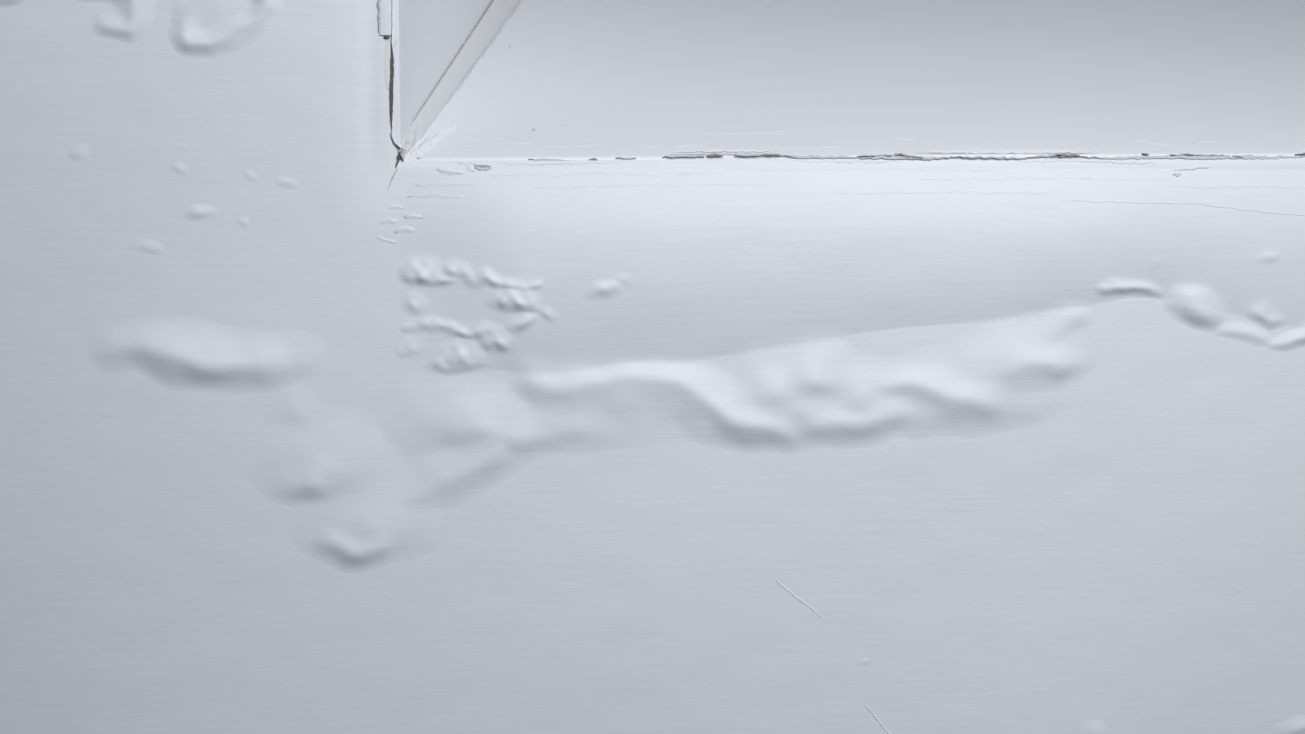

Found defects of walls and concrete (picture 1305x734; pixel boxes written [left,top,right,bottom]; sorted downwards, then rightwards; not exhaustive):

crack [384,0,522,190]
crack [457,149,1305,216]